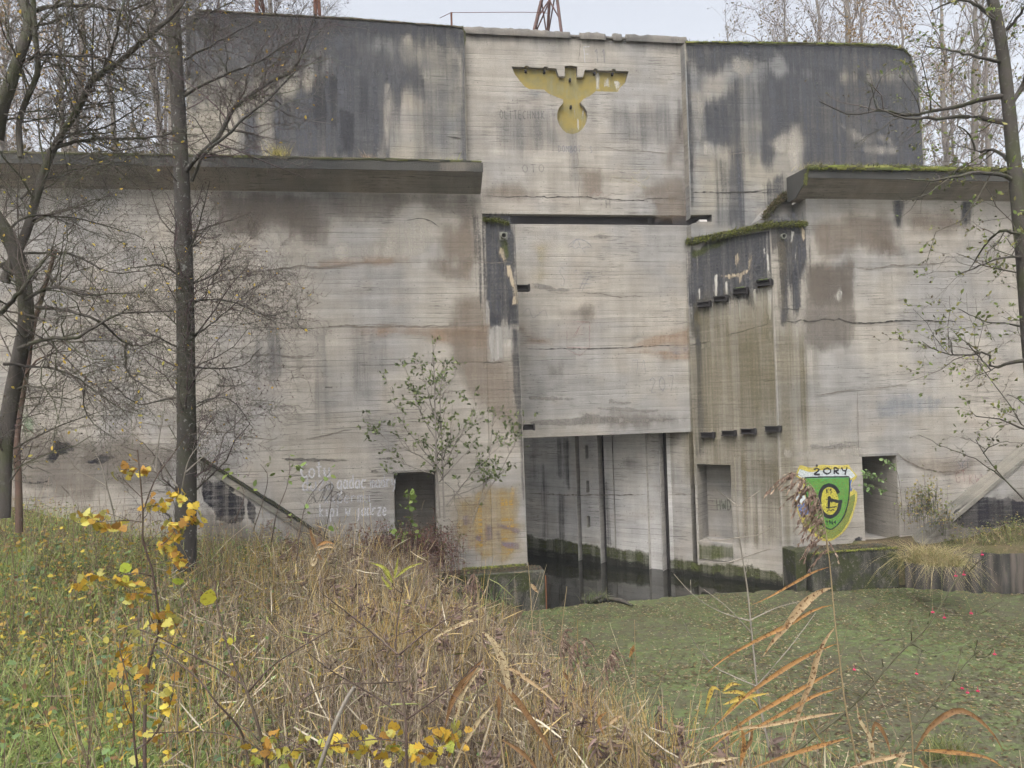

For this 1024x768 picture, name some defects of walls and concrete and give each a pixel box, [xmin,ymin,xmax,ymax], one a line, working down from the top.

damp [186,13,465,159]
damp [657,45,923,215]
damp [688,79,904,352]
crack [550,308,968,349]